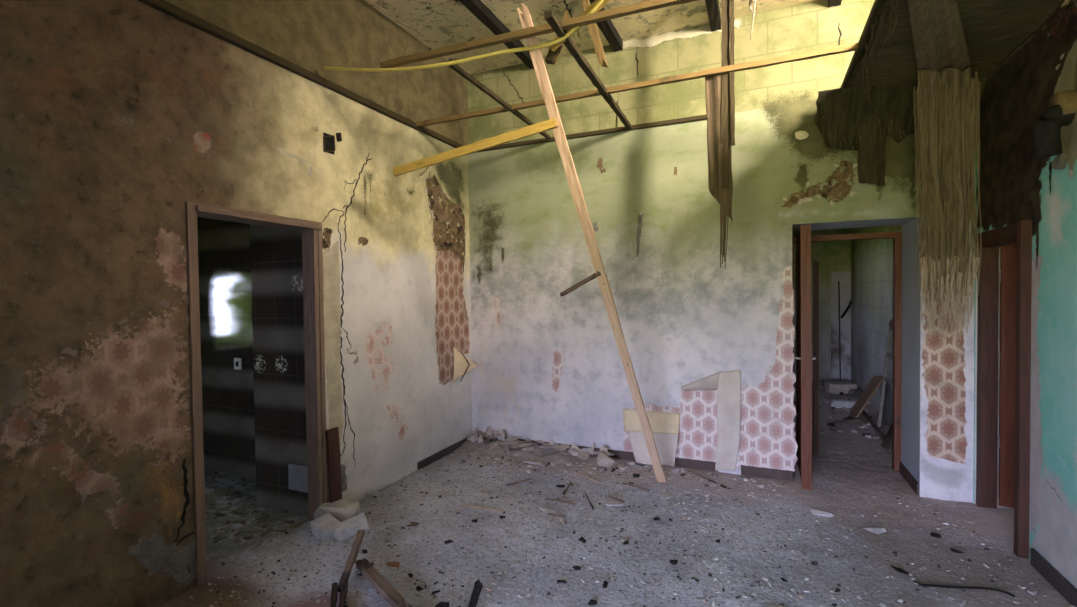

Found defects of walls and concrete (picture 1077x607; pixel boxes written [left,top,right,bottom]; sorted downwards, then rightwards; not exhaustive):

spalling [623,24,722,49]
spalling [424,174,467,268]
damp [418,148,526,300]
spalling [781,160,857,208]
flaking render [1061,109,1077,178]
crack [321,153,373,467]
peeling [453,347,478,383]
peeling [681,370,748,471]
crack [174,459,195,573]